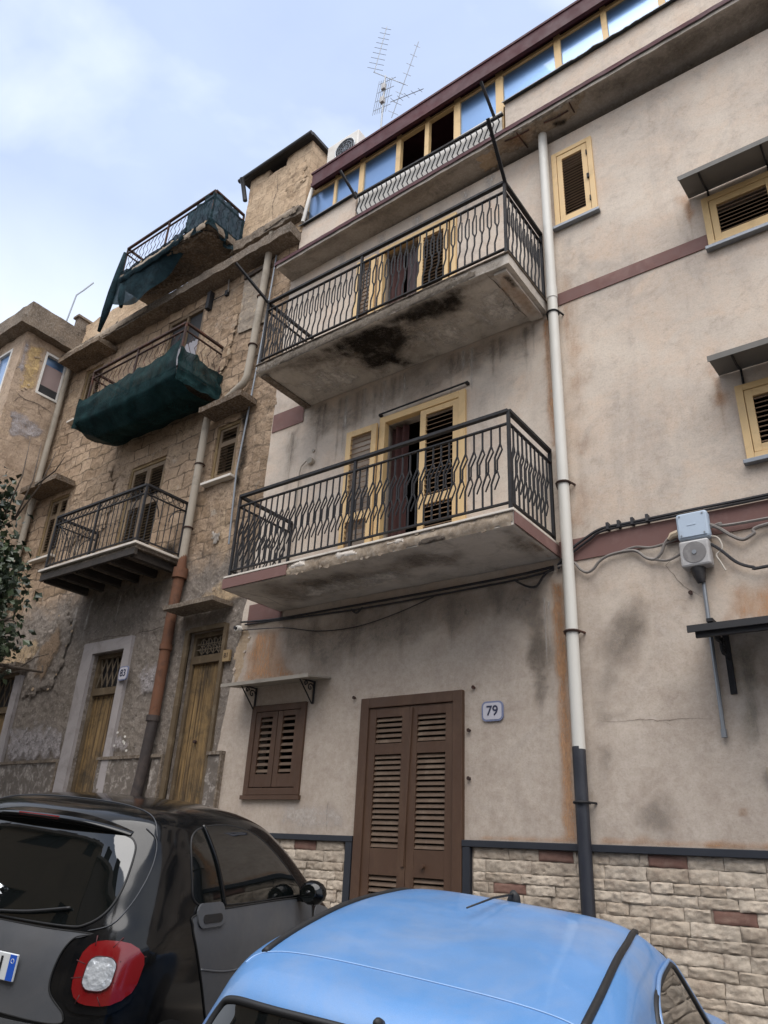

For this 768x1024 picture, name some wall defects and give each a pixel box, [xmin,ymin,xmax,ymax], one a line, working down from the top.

leakage [303,279,517,399]
spalling [282,511,513,576]
corrosion [548,585,575,838]